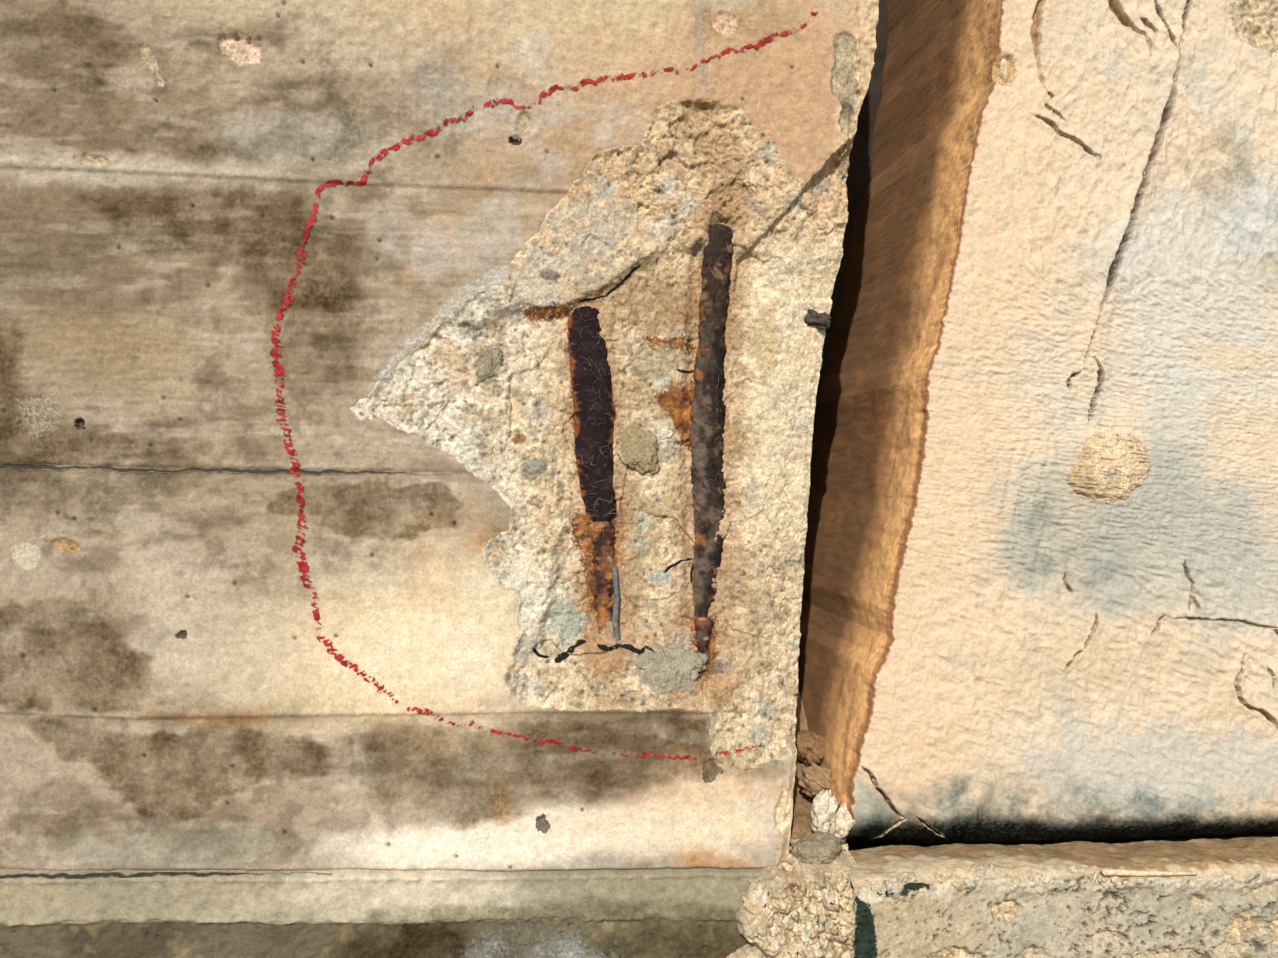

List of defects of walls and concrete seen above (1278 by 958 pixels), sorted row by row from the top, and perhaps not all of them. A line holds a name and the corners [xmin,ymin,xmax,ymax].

crack [1030,0,1102,159]
crack [1066,0,1194,422]
water stain [379,265,508,379]
water stain [17,392,68,436]
spalling [350,31,861,783]
efflorescence [10,542,44,573]
corrosion [568,514,599,619]
corrosion [687,614,720,681]
crack [861,766,945,839]